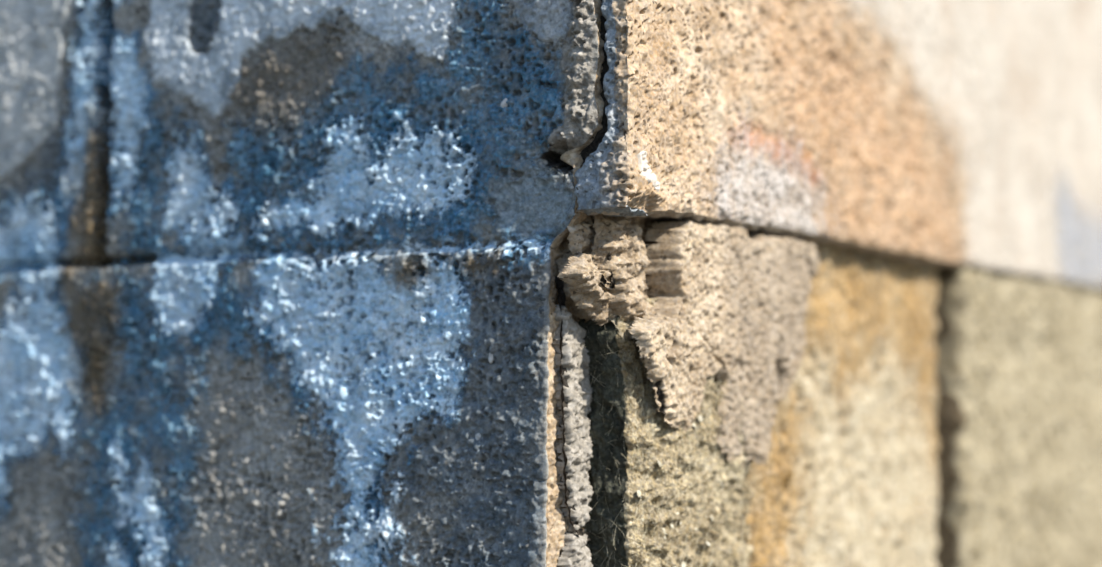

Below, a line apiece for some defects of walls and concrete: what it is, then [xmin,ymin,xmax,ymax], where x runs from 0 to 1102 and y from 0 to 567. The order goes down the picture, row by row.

crack [541,0,609,233]
damp [12,265,64,305]
damp [77,0,564,567]
spalling [556,213,661,331]
damp [0,443,13,506]
crack [555,276,592,541]